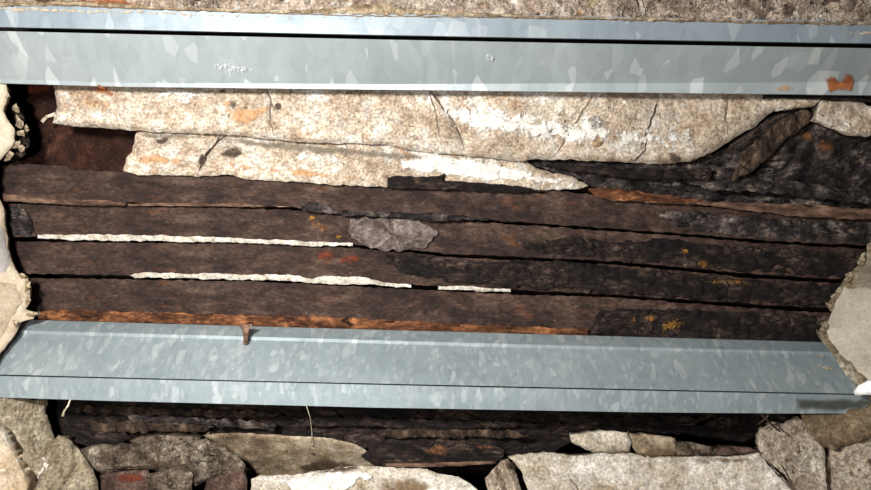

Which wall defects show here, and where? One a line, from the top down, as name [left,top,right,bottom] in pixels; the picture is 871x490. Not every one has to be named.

crack [0,0,868,25]
peeling [154,90,204,98]
spalling [4,102,31,162]
peeling [440,104,691,163]
spalling [220,145,241,157]
peeling [298,153,343,164]
peeling [401,153,563,184]
spalling [825,243,871,312]
spalling [12,273,37,327]